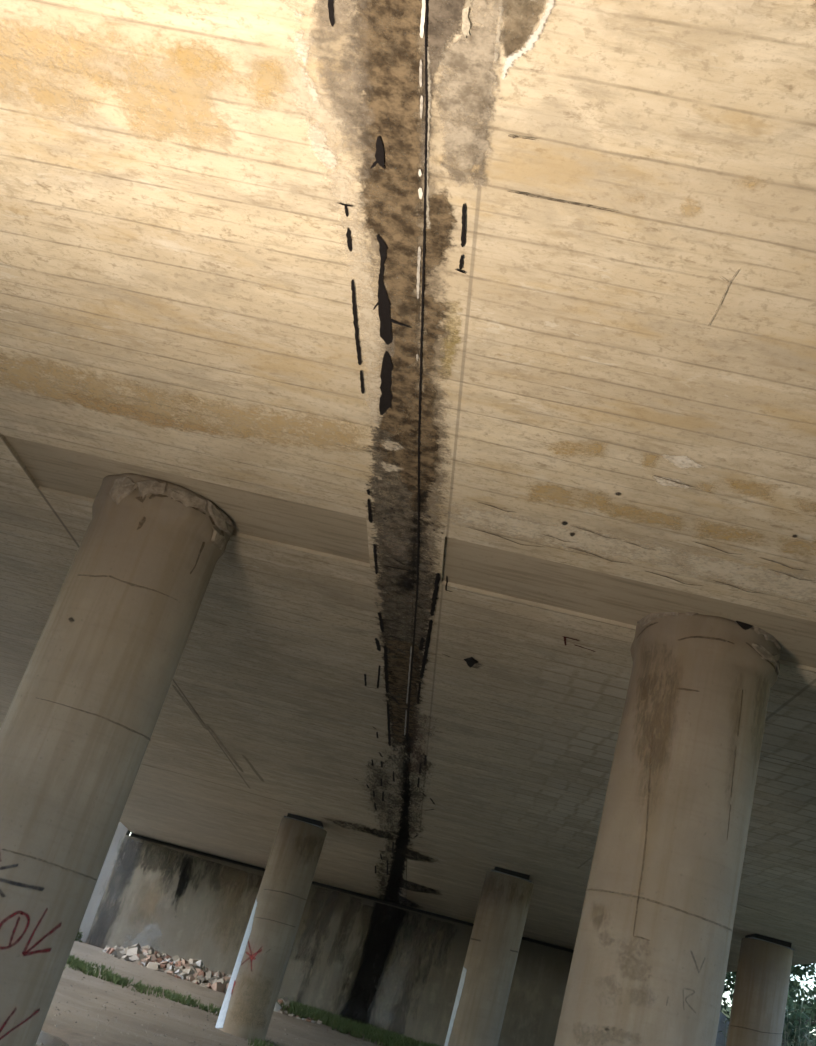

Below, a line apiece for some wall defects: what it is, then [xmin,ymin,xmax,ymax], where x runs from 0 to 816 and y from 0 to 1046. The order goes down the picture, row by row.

leakage [501,0,554,79]
peeling [426,0,504,227]
crack [339,203,354,252]
crack [455,204,466,274]
crack [508,191,618,213]
crack [351,280,365,394]
crack [354,0,452,810]
leakage [296,0,465,1036]
leakage [88,838,263,948]